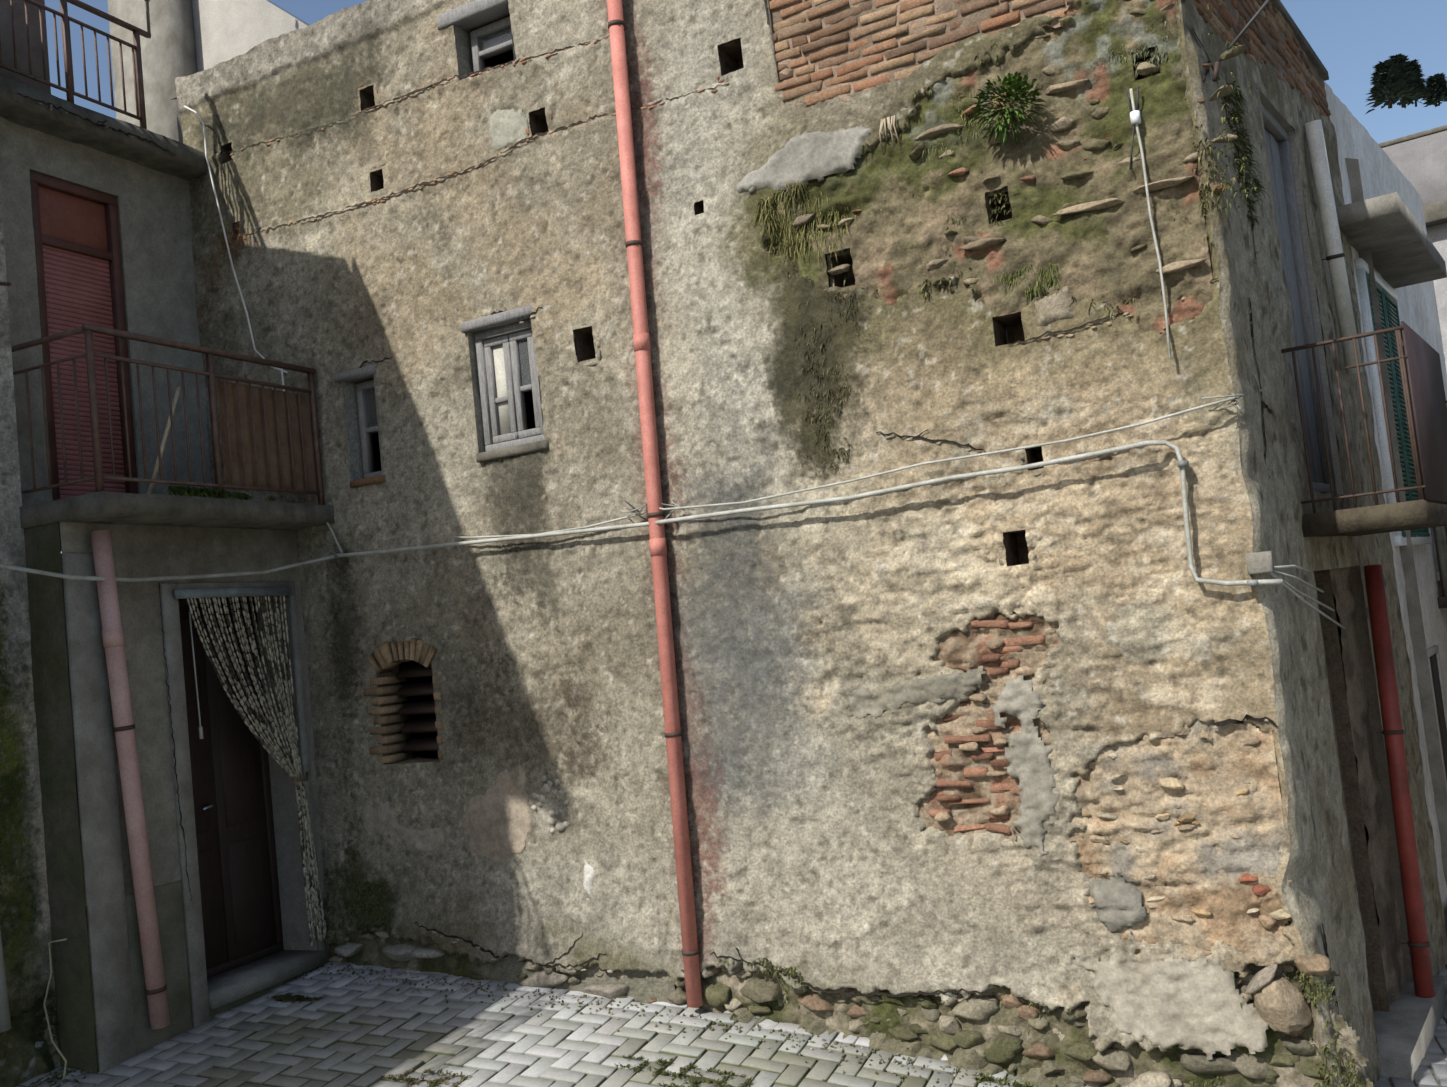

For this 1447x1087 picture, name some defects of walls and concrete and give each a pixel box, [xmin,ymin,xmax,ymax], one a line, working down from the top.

crack [222,35,610,156]
crack [232,83,729,240]
leakage [746,248,864,474]
leakage [684,479,807,789]
flaking render [918,612,1059,841]
crack [1212,714,1278,729]
crack [414,922,620,973]
flaking render [328,720,1373,1087]
crack [710,946,996,997]